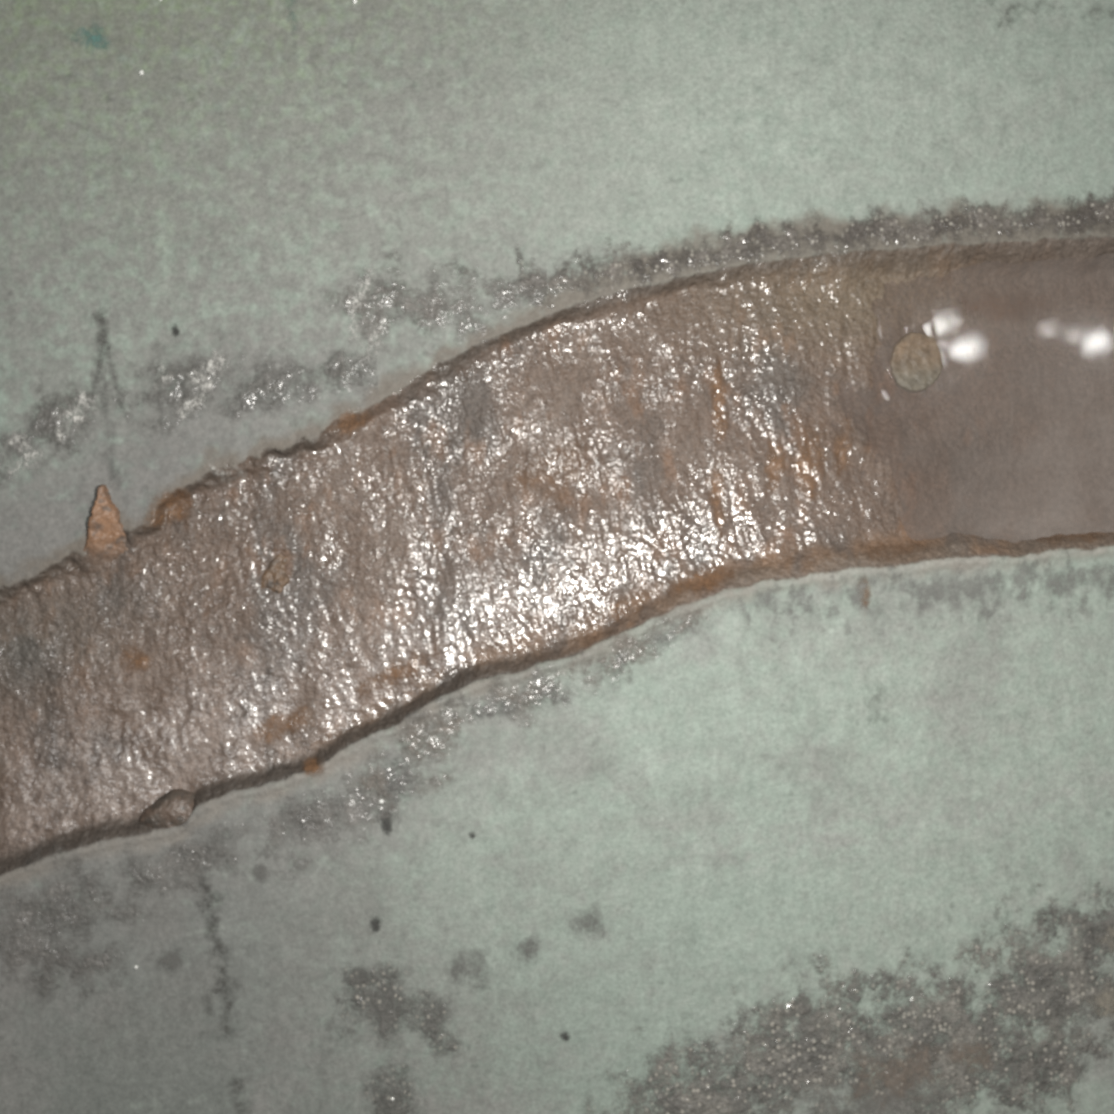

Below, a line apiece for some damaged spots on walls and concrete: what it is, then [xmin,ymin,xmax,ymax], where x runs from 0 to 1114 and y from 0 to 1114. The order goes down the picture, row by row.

rust [712,363,728,439]
rust [83,485,128,573]
rust [711,466,725,534]
rust [765,438,825,501]
rust [603,589,654,620]
rust [356,659,418,698]
leakage [338,967,457,1051]
leakage [373,1068,412,1114]